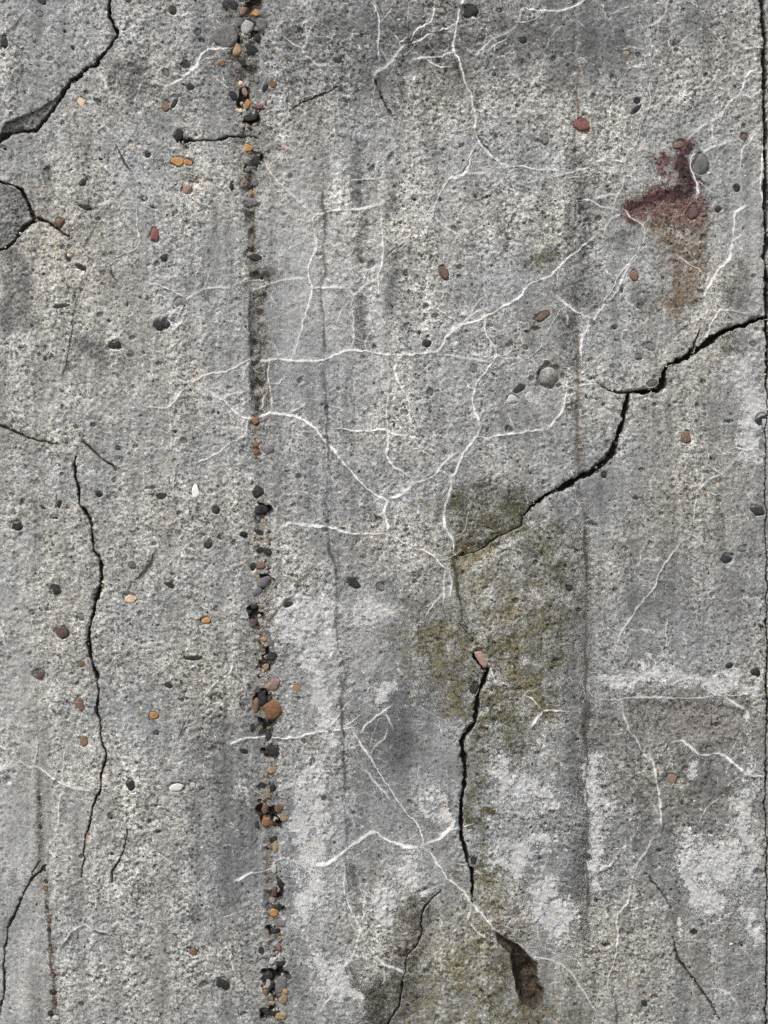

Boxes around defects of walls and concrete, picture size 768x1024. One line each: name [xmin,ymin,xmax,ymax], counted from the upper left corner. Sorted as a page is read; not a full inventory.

crack [0,0,229,144]
crack [149,283,226,330]
rust [619,137,706,315]
crack [206,0,768,1024]
crack [0,425,156,1015]
spalling [495,931,544,1009]